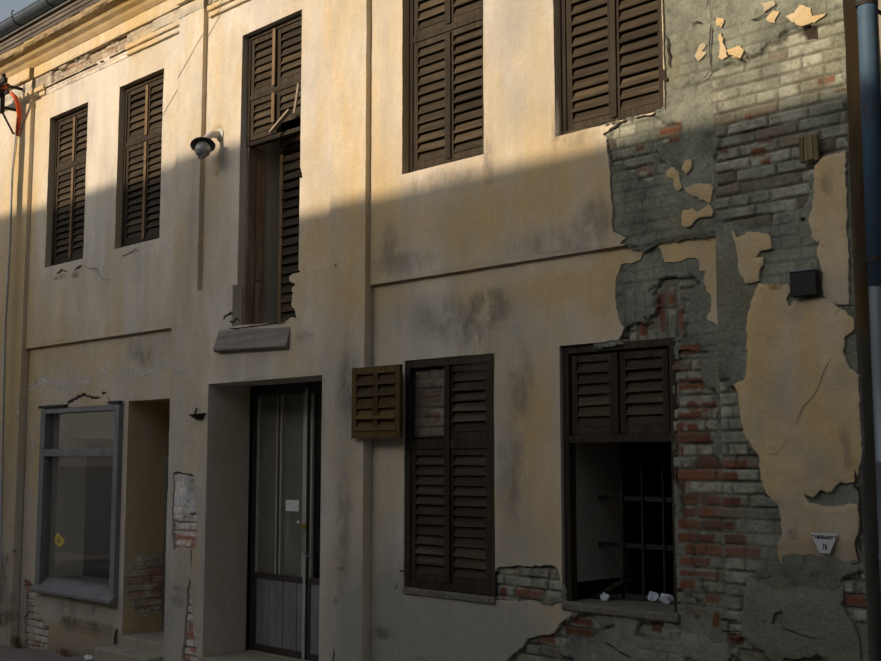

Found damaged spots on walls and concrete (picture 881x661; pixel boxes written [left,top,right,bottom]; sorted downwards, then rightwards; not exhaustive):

spalling [497,0,868,661]
crack [67,391,111,406]
spalling [173,473,197,550]
spalling [124,551,163,618]